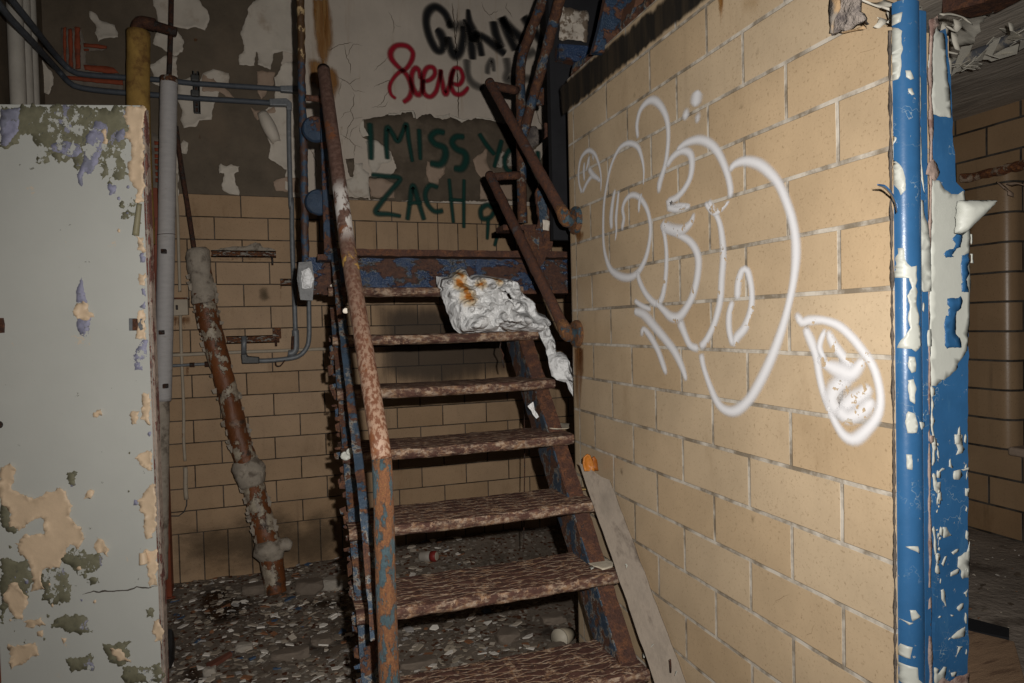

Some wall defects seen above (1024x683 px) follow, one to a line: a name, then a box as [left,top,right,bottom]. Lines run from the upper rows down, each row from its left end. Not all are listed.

peeling [150,0,234,196]
peeling [239,0,309,195]
peeling [938,12,1024,76]
peeling [219,164,240,195]
peeling [346,110,550,243]
corrosion [575,348,583,388]